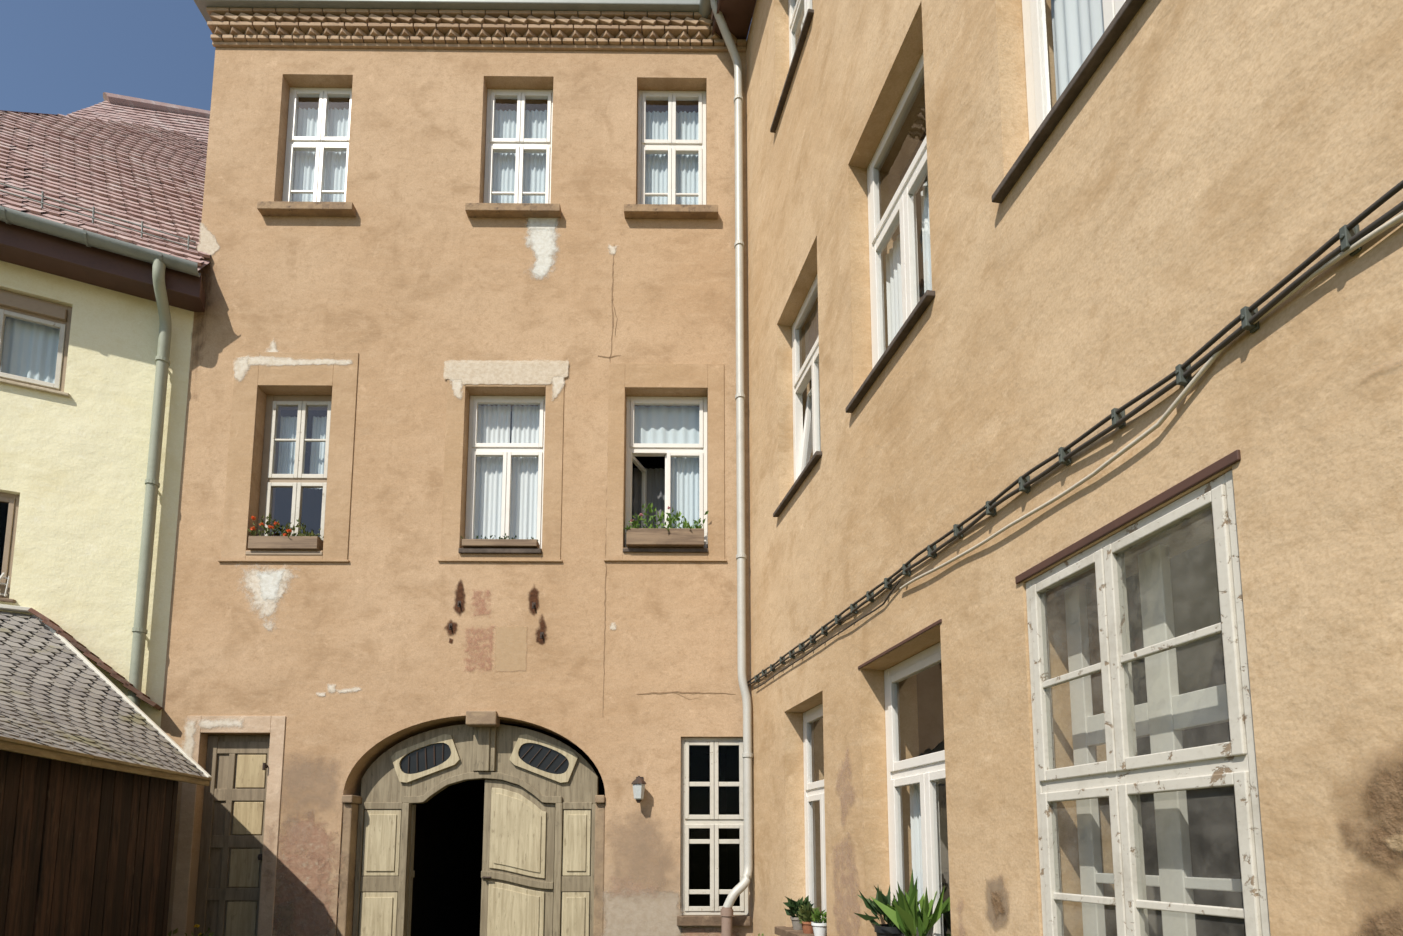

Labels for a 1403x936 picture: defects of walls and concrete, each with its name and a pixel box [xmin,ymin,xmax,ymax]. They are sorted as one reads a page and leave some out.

peeling [526,218,557,278]
peeling [245,567,293,630]
spalling [1342,750,1403,936]
spalling [987,877,1008,928]